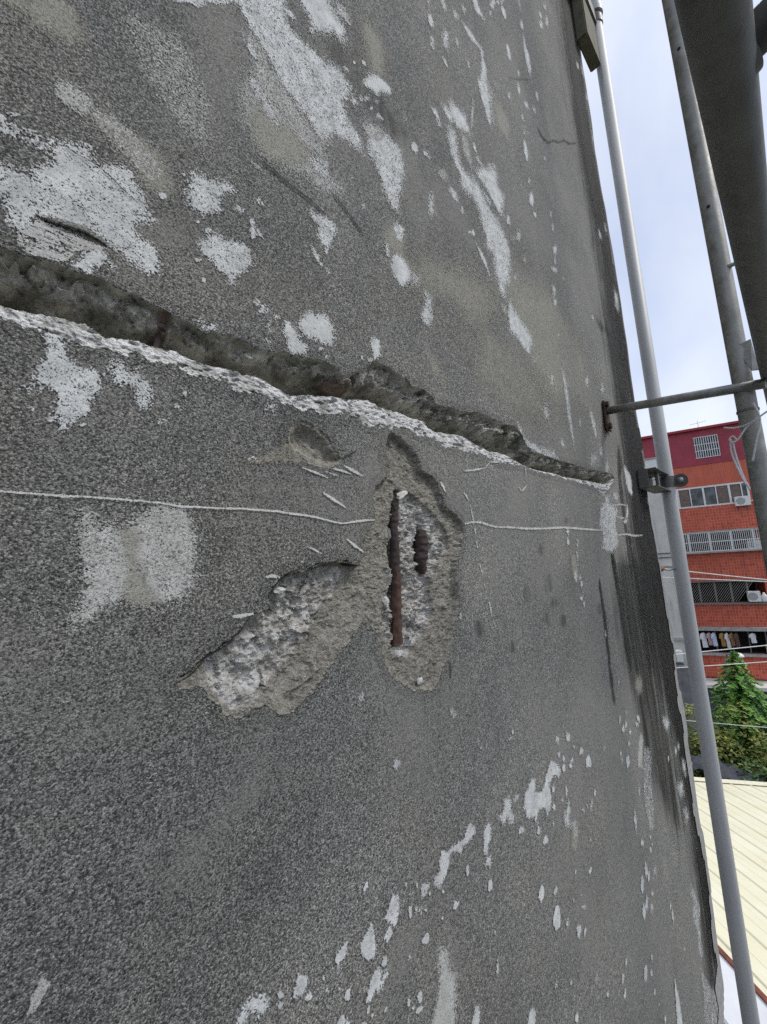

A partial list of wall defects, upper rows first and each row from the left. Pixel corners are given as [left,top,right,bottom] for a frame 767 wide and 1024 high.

water stain [7,0,84,45]
water stain [91,107,175,196]
water stain [127,15,213,149]
water stain [232,74,345,200]
water stain [357,19,403,133]
crack [0,232,615,495]
water stain [410,259,591,421]
spalling [159,429,468,734]
efflorescence [432,946,457,1024]